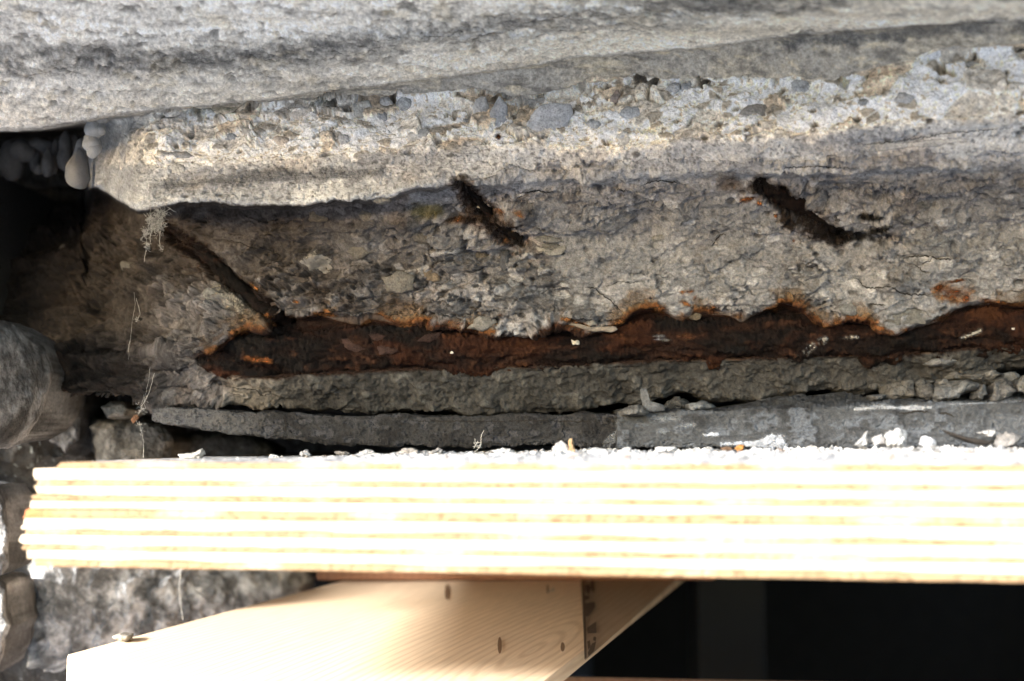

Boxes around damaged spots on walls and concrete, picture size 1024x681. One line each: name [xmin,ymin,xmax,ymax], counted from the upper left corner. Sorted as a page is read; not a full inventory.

water stain [0,118,109,189]
spalling [0,43,1024,414]
corrosion [149,215,742,357]
corrosion [755,279,1024,337]
corrosion [229,358,445,381]
crack [225,386,342,431]
crack [897,409,955,417]